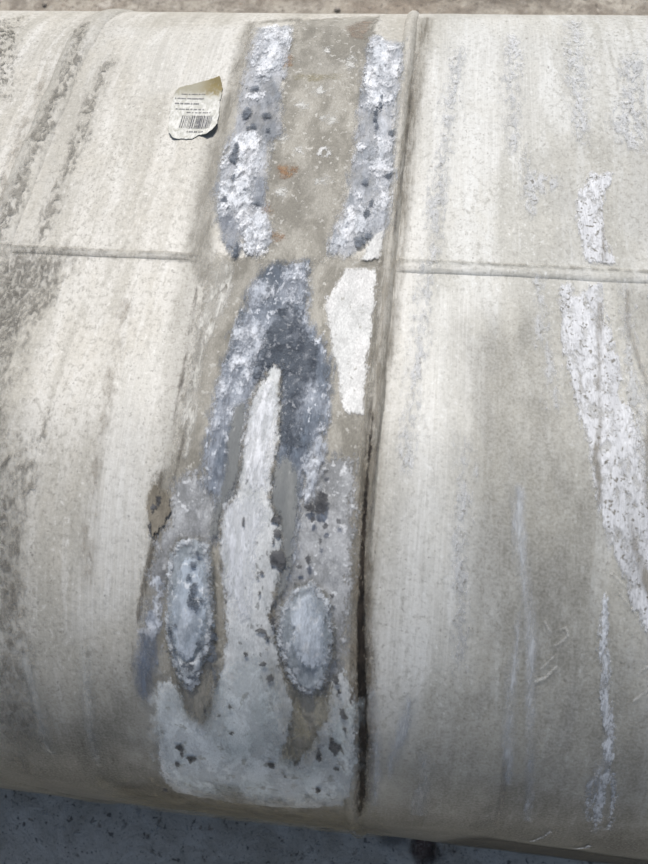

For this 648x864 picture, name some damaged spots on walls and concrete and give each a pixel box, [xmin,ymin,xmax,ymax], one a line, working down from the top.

spalling [146,485,173,538]
peeling [182,264,233,456]
peeling [154,365,358,809]
peeling [324,231,384,415]
crack [350,402,374,816]
damp [575,172,615,264]
damp [585,593,616,830]
damp [559,282,648,632]